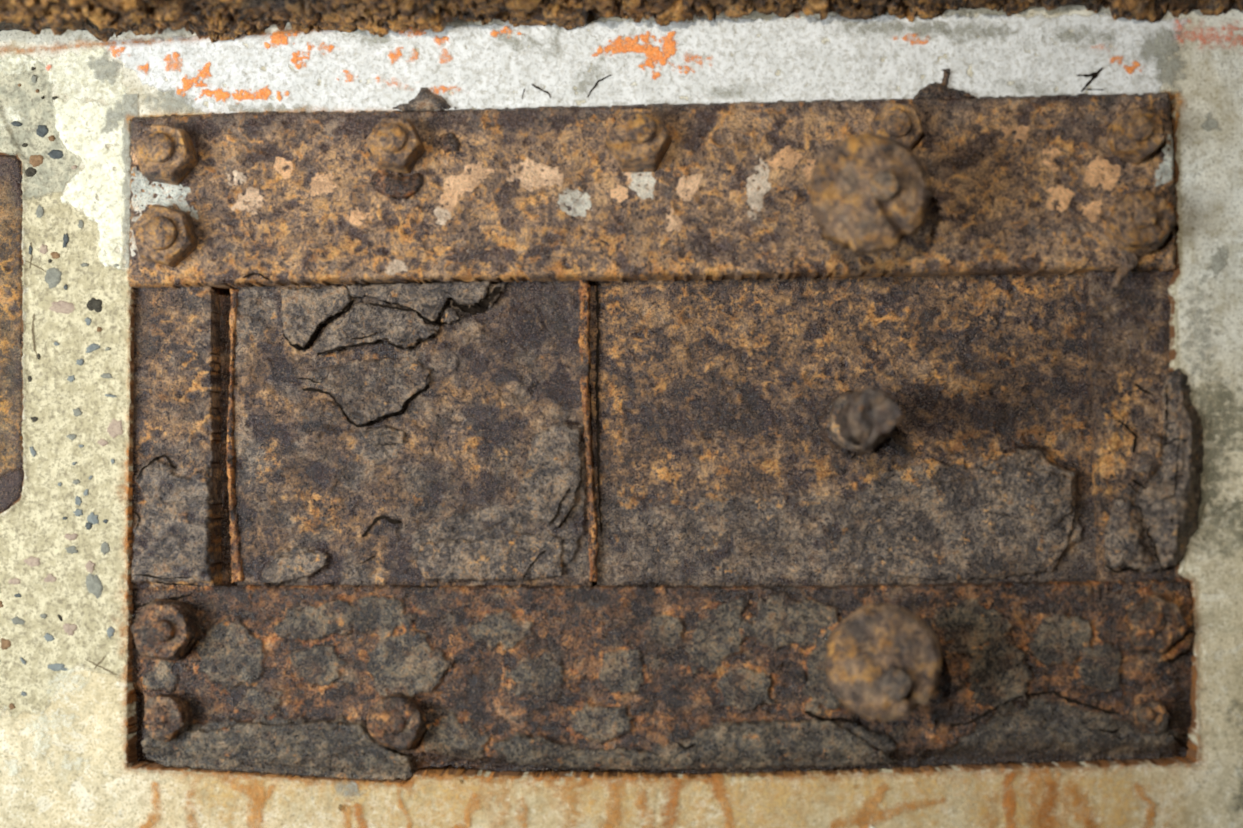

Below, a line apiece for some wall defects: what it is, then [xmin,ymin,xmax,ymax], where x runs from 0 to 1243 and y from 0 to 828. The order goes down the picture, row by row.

peeling [103,13,1243,114]
flaking render [1201,113,1221,131]
flaking render [1208,247,1228,277]
spalling [0,47,138,718]
crack [283,287,501,427]
rust [280,281,506,446]
rust [261,550,329,584]
rust [417,425,582,581]
rust [838,448,1077,581]
rust [1126,581,1196,663]
rust [123,666,897,828]
rust [997,766,1097,828]